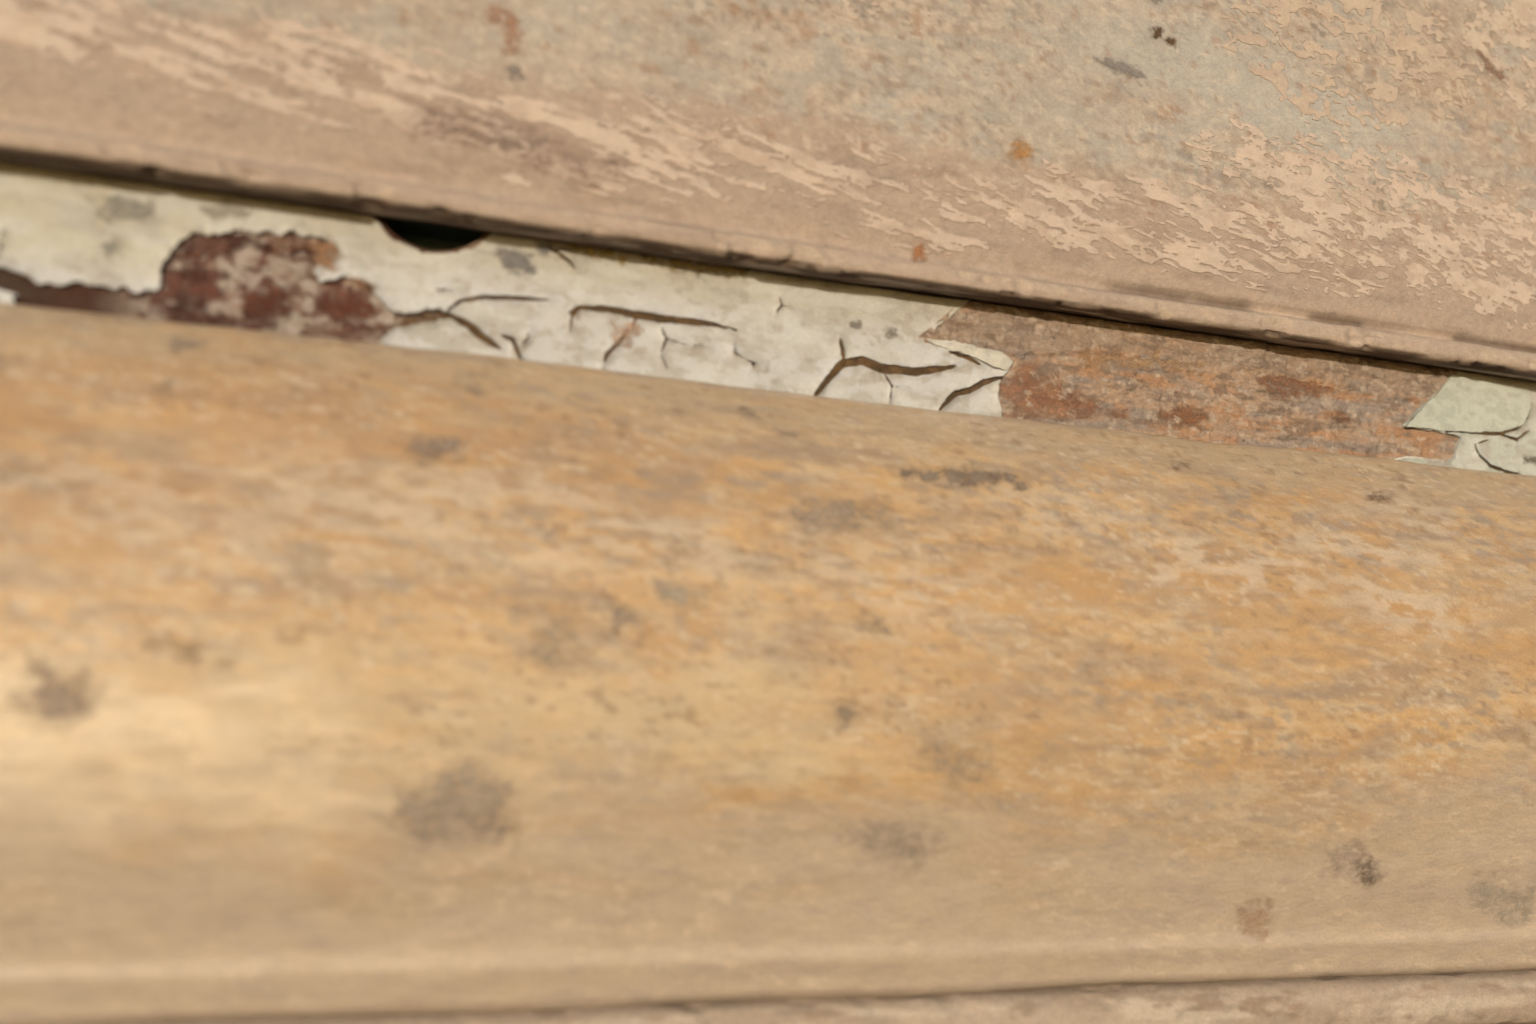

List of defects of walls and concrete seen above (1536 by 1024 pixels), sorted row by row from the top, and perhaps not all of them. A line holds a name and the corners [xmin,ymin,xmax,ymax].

peeling [0,0,1536,343]
rust [150,234,446,340]
crack [437,242,755,368]
crack [813,340,1002,411]
rust [999,363,1126,419]
rust [1159,405,1207,424]
rust [1259,376,1330,400]